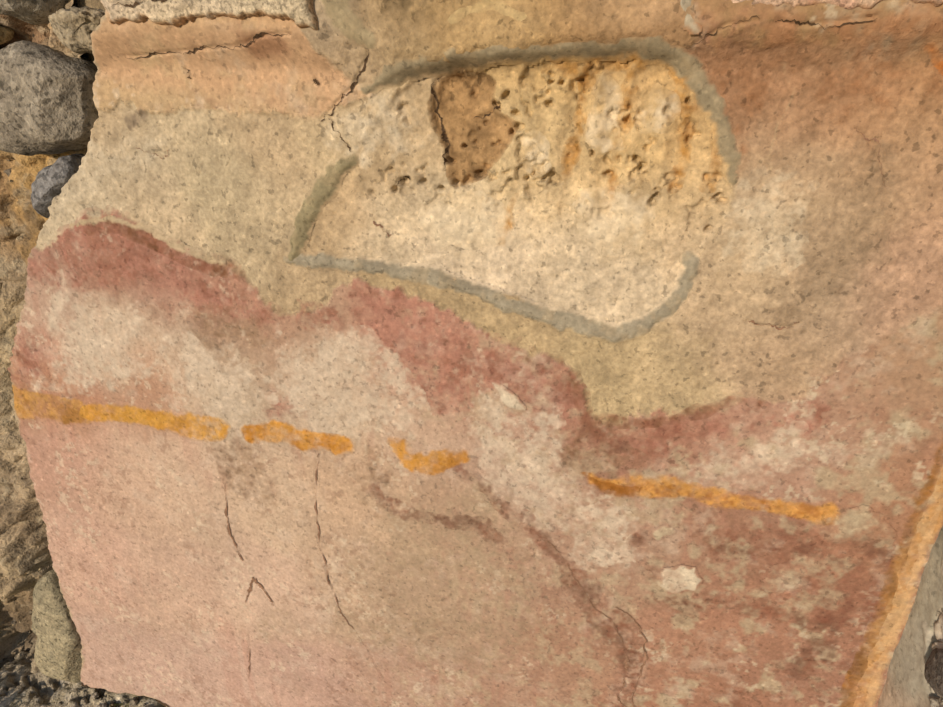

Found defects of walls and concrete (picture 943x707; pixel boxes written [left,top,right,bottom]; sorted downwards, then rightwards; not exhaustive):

crack [111,0,167,8]
peeling [27,0,943,475]
peeling [8,322,51,388]
crack [224,486,274,606]